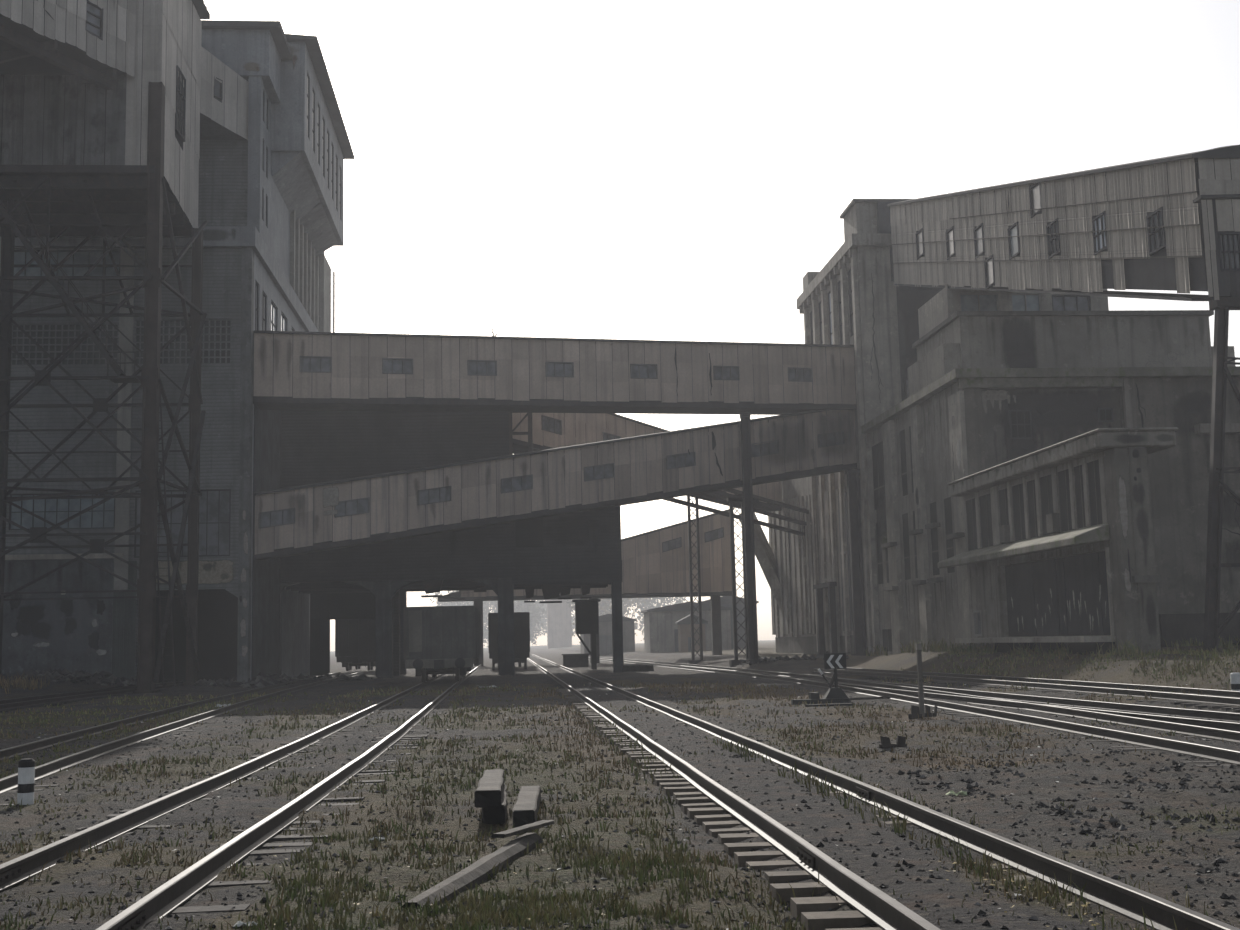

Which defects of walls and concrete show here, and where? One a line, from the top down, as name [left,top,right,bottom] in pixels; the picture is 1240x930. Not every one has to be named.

crack [688,432,723,476]